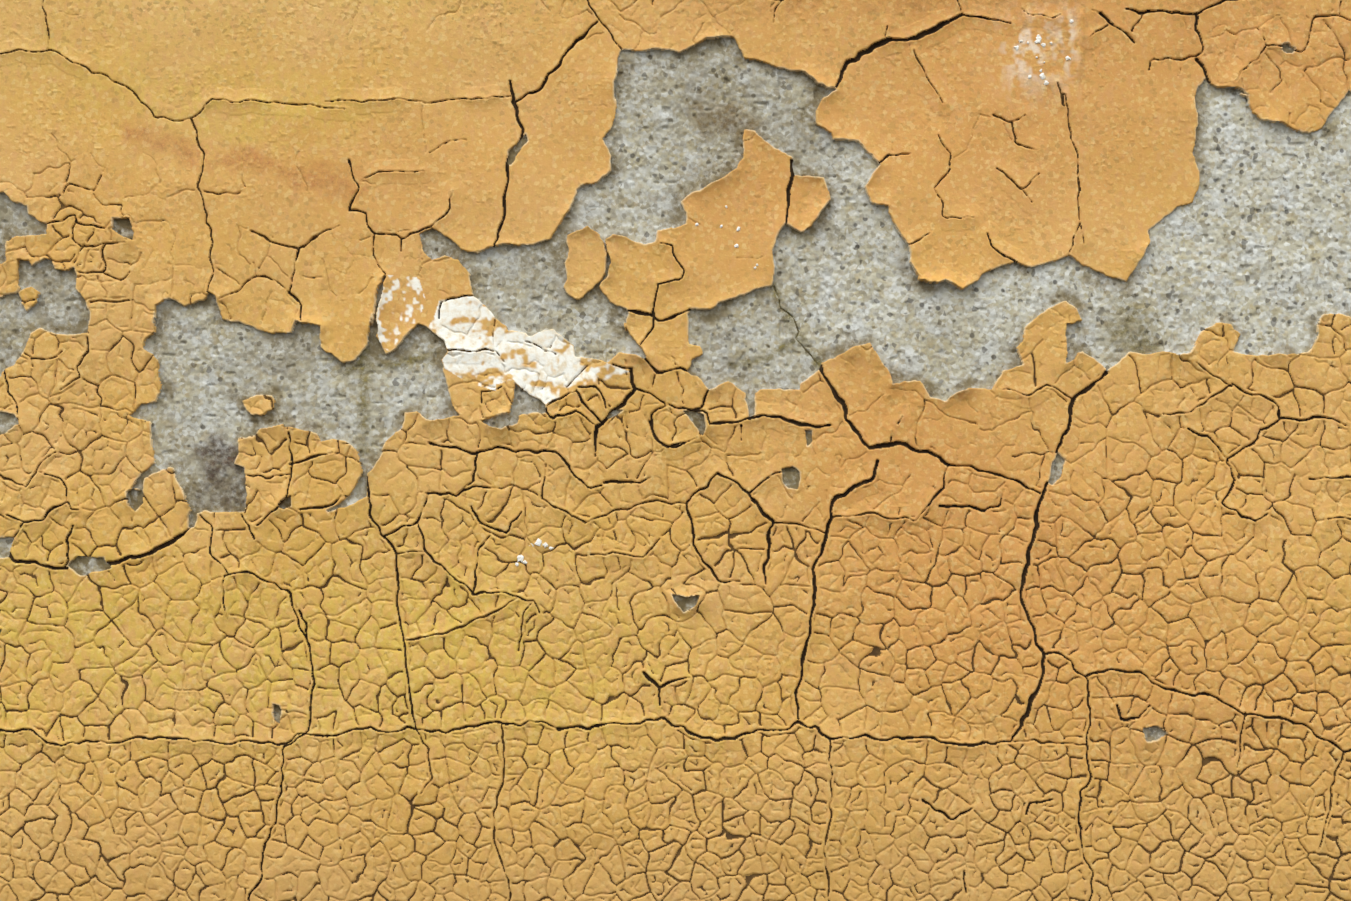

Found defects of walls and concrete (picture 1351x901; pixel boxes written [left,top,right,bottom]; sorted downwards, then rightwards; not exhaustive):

crack [835,0,1056,103]
crack [1093,0,1350,102]
peeling [112,217,134,240]
crack [0,0,654,320]
crack [785,159,795,225]
crack [1057,82,1084,252]
peeling [0,192,90,376]
peeling [126,35,1351,530]
peeling [0,412,19,435]
peeling [68,556,111,576]
peeling [515,538,554,566]
crack [0,242,1351,901]